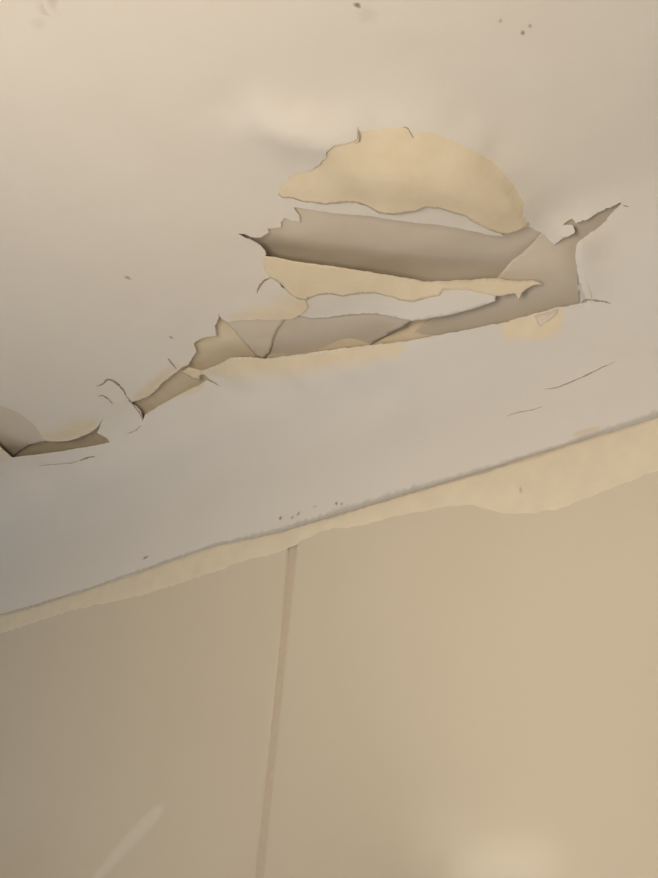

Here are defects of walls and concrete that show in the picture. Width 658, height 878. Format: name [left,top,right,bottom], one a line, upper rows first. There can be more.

peeling [0,126,646,477]